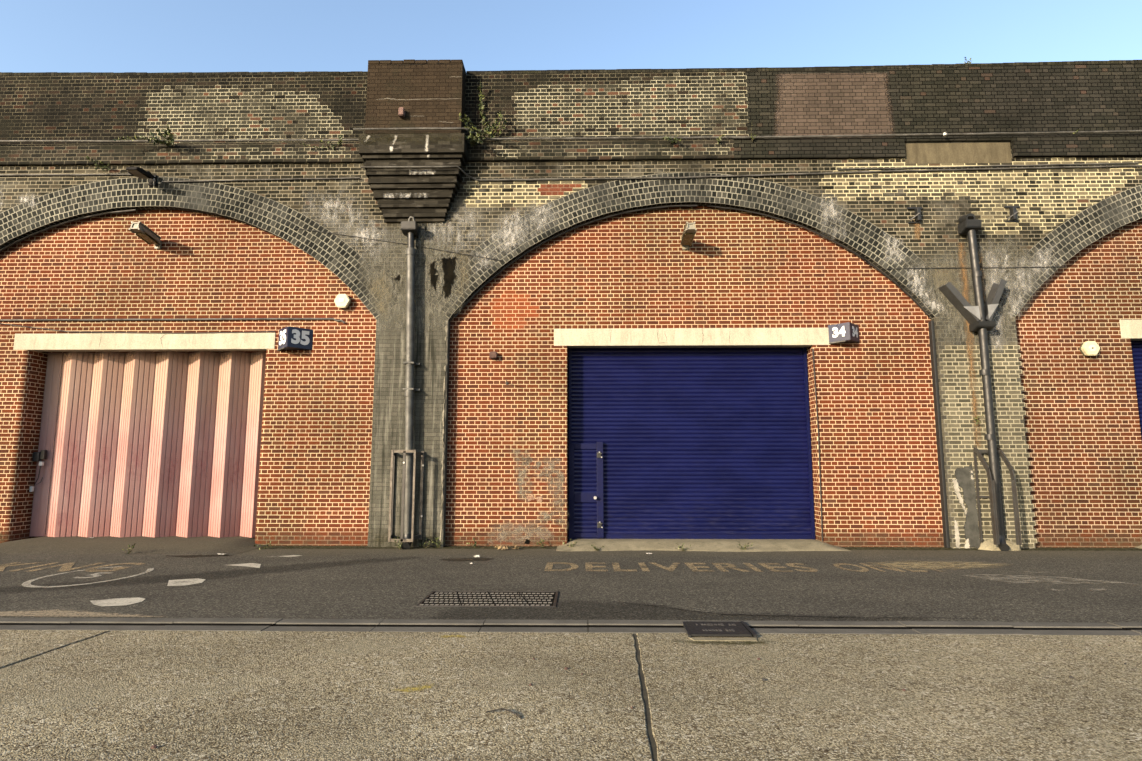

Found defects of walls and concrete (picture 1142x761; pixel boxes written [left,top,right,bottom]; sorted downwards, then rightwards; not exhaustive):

damp [311,198,551,333]